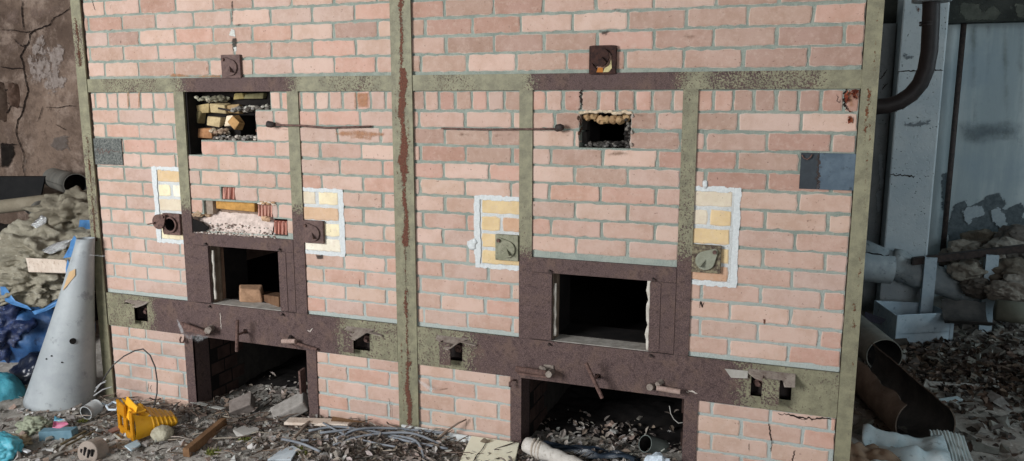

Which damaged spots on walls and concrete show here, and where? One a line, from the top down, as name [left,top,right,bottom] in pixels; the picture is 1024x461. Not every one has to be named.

crack [1,1,95,176]
corrosion [844,89,873,170]
corrosion [395,0,412,426]
peeling [941,173,1024,242]
crack [768,413,831,461]